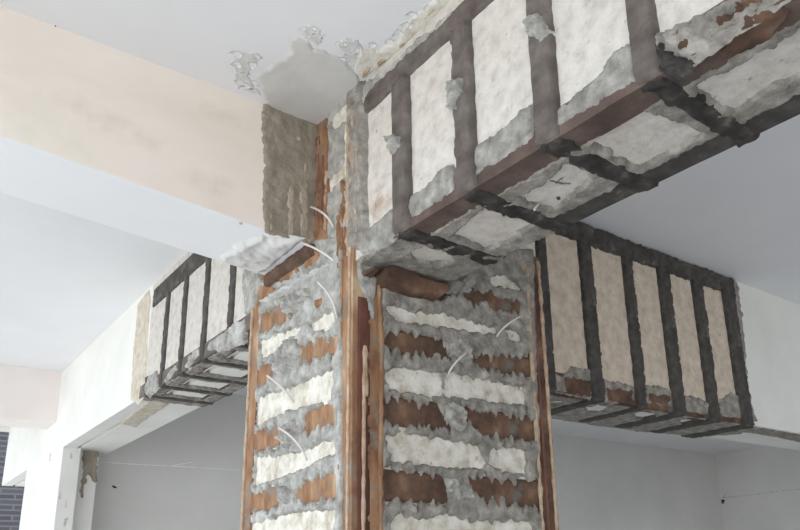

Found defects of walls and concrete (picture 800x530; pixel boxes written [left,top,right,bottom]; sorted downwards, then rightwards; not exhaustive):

peeling [335,0,451,78]
rust [716,0,789,59]
spalling [121,251,246,427]
spalling [546,234,588,373]
spalling [591,246,634,387]
spalling [632,261,670,390]
spalling [670,274,706,401]
spalling [703,286,736,402]
spalling [79,450,99,498]